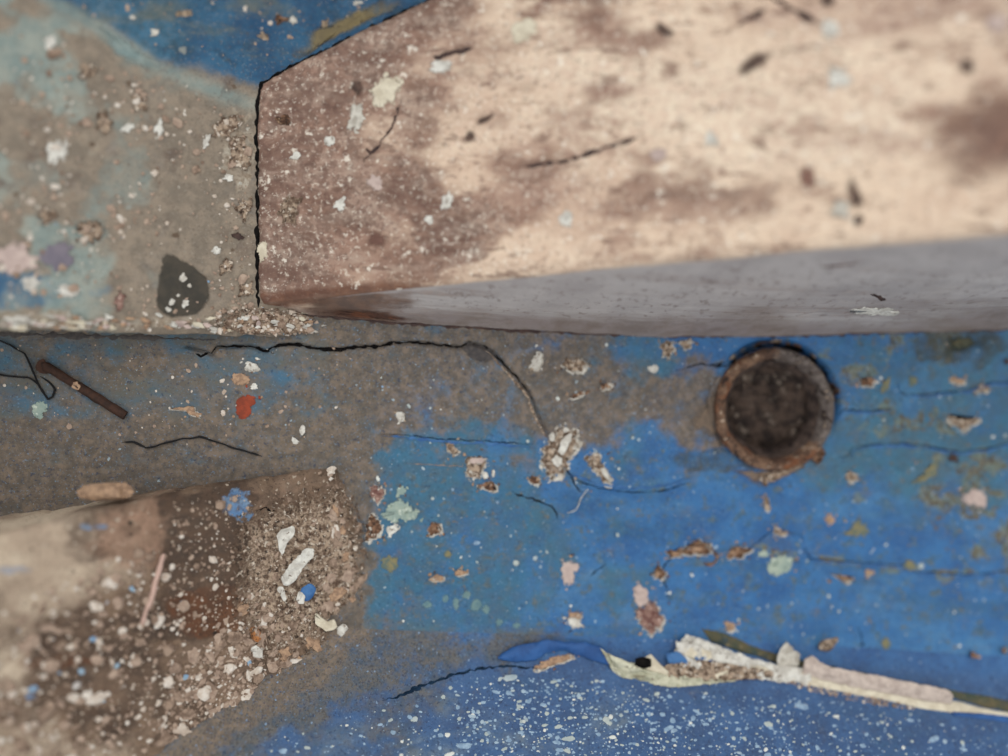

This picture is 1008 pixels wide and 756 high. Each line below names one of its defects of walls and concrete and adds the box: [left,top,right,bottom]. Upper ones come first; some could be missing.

peeling [3,290,151,331]
peeling [164,308,326,335]
crack [186,341,546,467]
peeling [527,423,619,488]
crack [838,442,1008,458]
crack [511,490,558,521]
spalling [228,471,399,664]
peeling [649,537,754,581]
crack [751,529,1008,578]
peeling [635,599,671,638]
peeling [533,652,580,673]
peeling [600,634,1008,716]